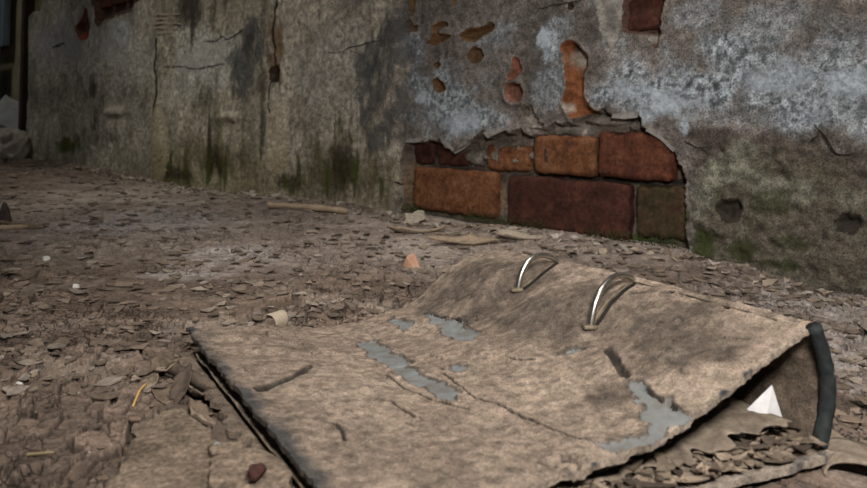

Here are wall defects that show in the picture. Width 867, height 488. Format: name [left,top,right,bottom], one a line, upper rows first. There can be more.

spalling [75,0,134,41]
crack [153,38,225,110]
leakage [179,0,268,96]
crack [206,29,243,42]
crack [267,0,280,118]
spalling [427,20,495,63]
spalling [595,0,665,50]
spalling [387,40,690,251]
spalling [403,253,420,268]